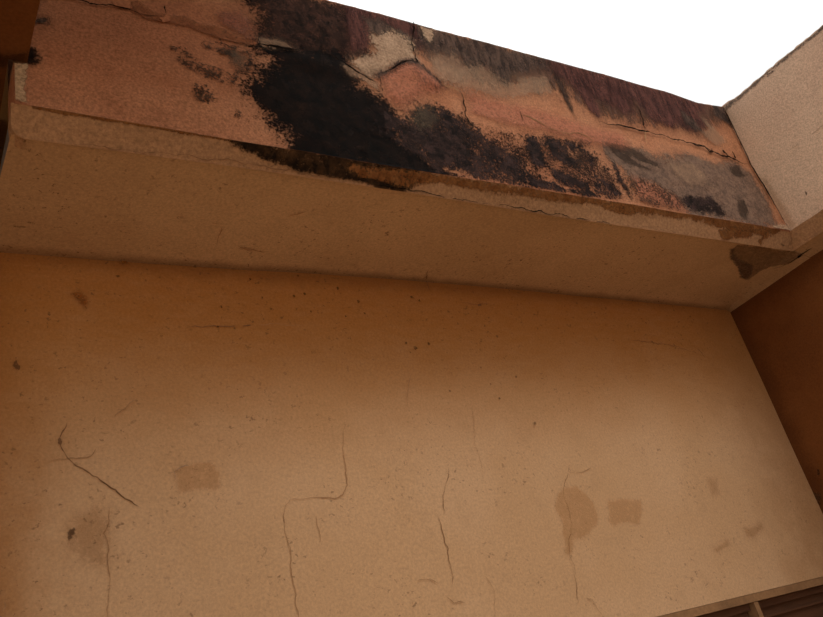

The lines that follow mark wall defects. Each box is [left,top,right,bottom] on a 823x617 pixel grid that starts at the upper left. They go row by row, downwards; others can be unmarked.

crack [80,0,166,16]
crack [443,84,473,126]
damp [169,0,823,227]
crack [385,185,610,224]
crack [520,106,812,268]
crack [54,424,137,506]
crack [283,425,348,617]
crack [419,469,464,603]